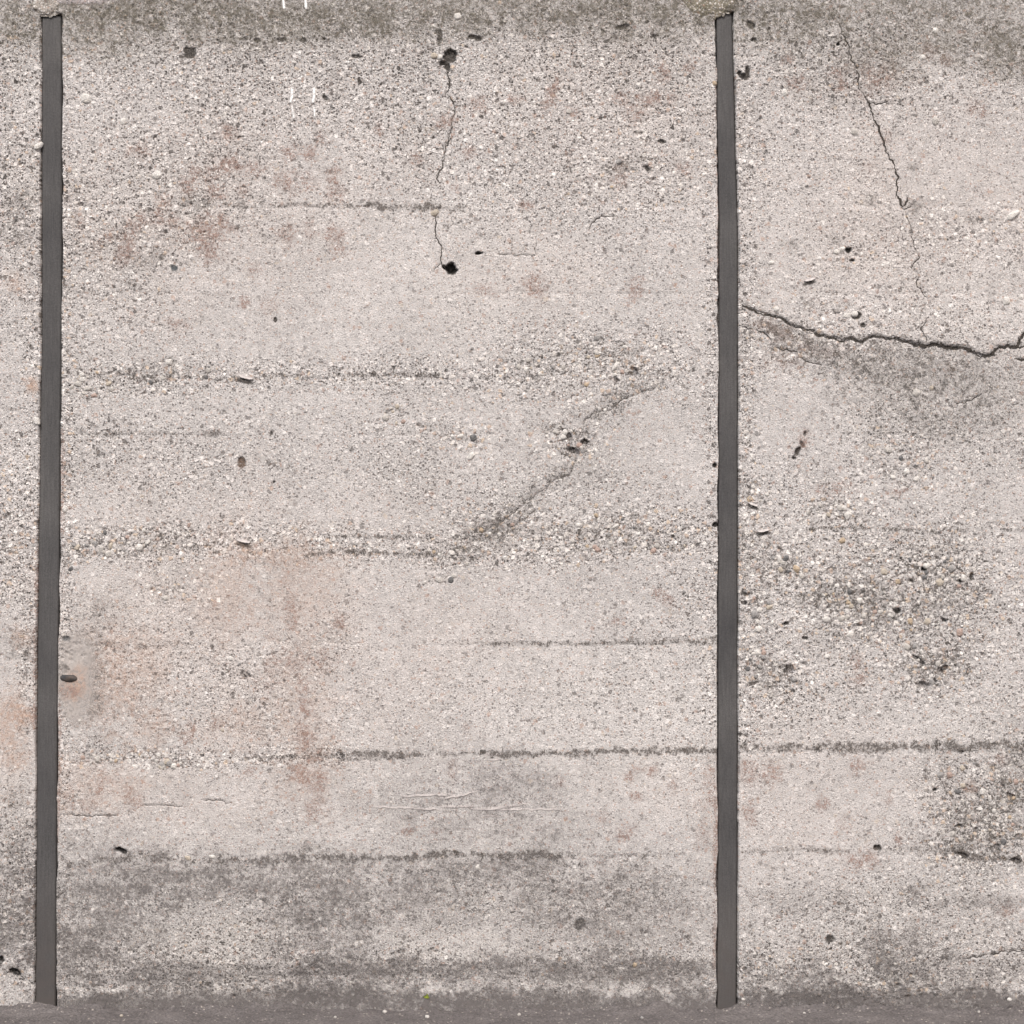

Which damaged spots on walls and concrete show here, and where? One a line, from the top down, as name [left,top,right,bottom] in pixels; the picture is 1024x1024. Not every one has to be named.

crack [436,70,455,184]
crack [434,216,445,268]
crack [742,21,1024,365]